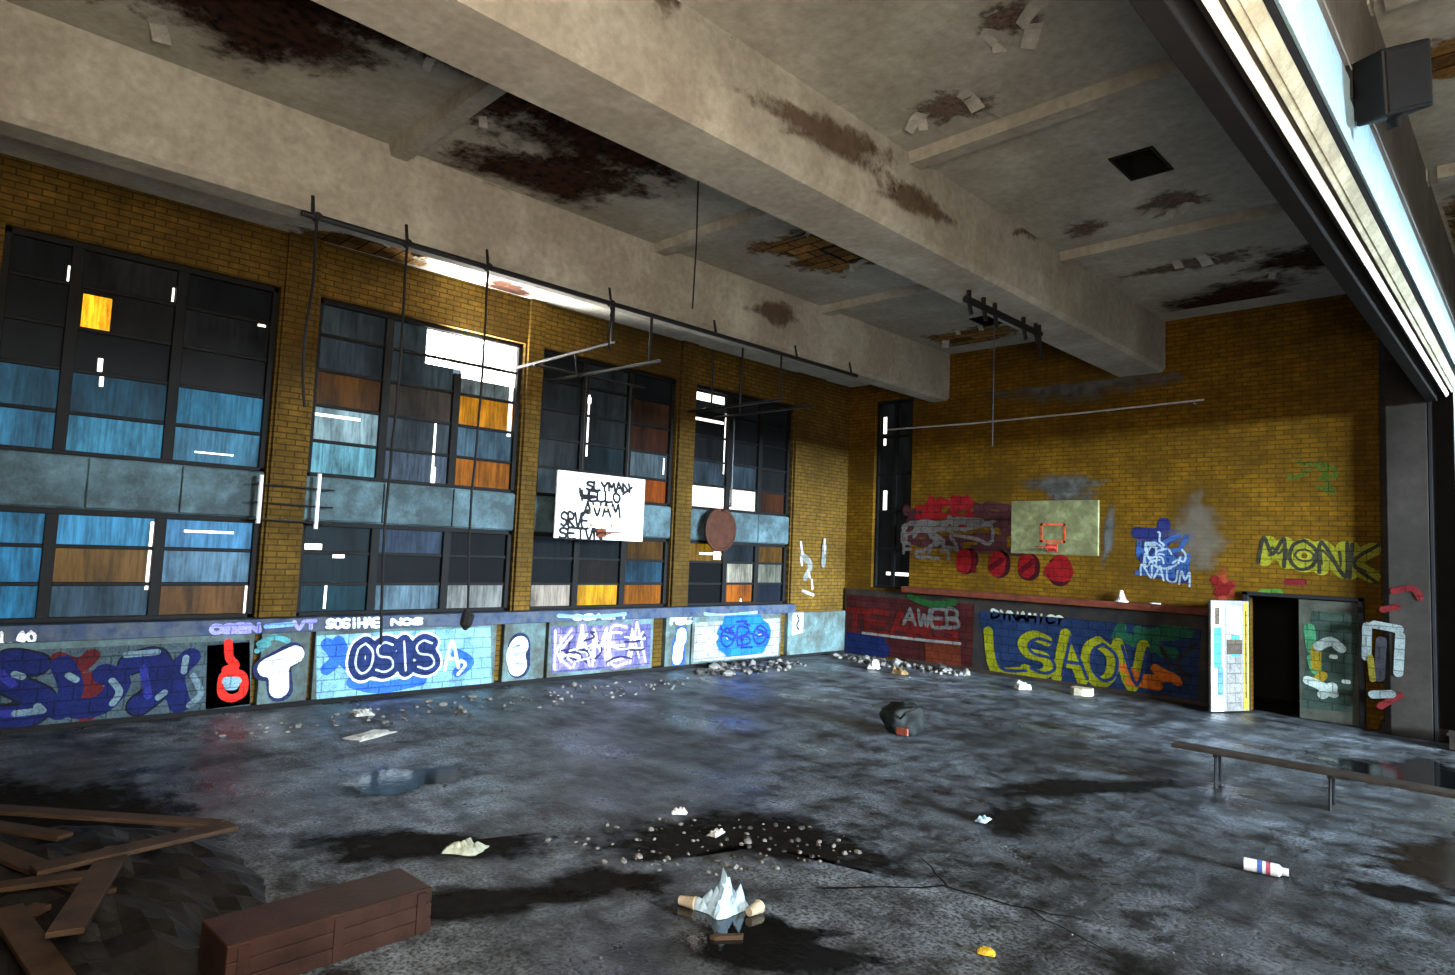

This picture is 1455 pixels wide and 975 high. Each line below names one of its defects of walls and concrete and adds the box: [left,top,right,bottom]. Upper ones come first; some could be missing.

peeling [1431,38,1455,80]
peeling [1443,196,1455,245]
peeling [747,229,882,278]